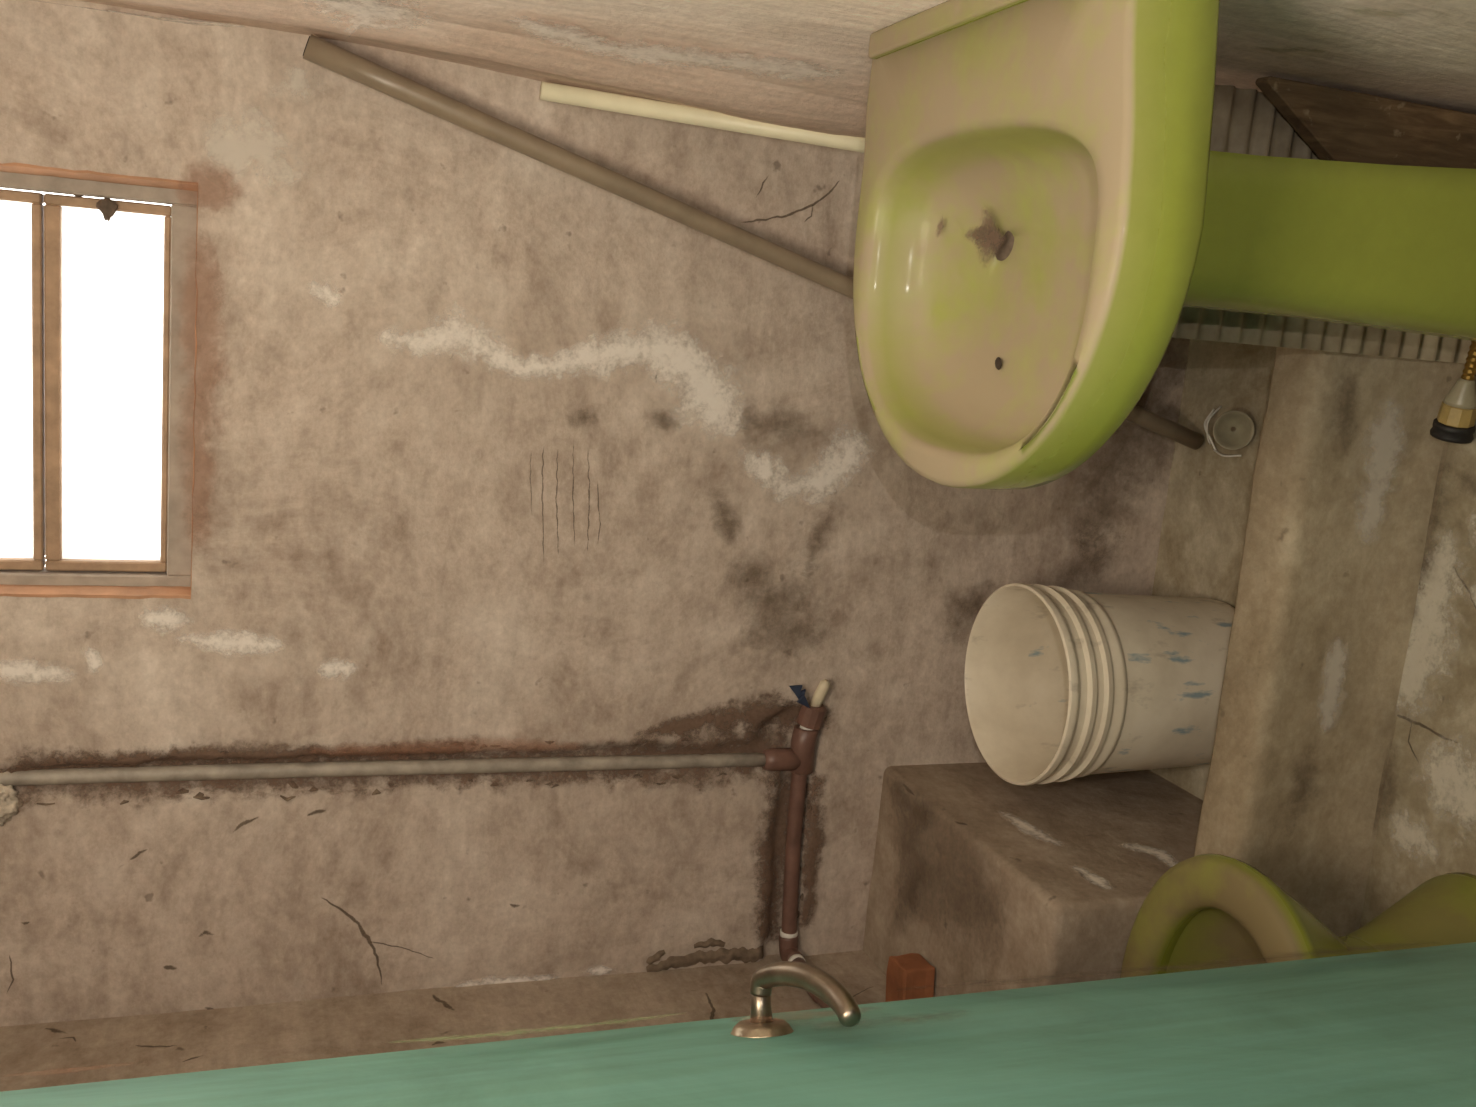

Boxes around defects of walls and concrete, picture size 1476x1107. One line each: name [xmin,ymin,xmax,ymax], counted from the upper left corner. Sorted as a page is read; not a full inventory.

damp [380,309,743,436]
damp [744,432,870,504]